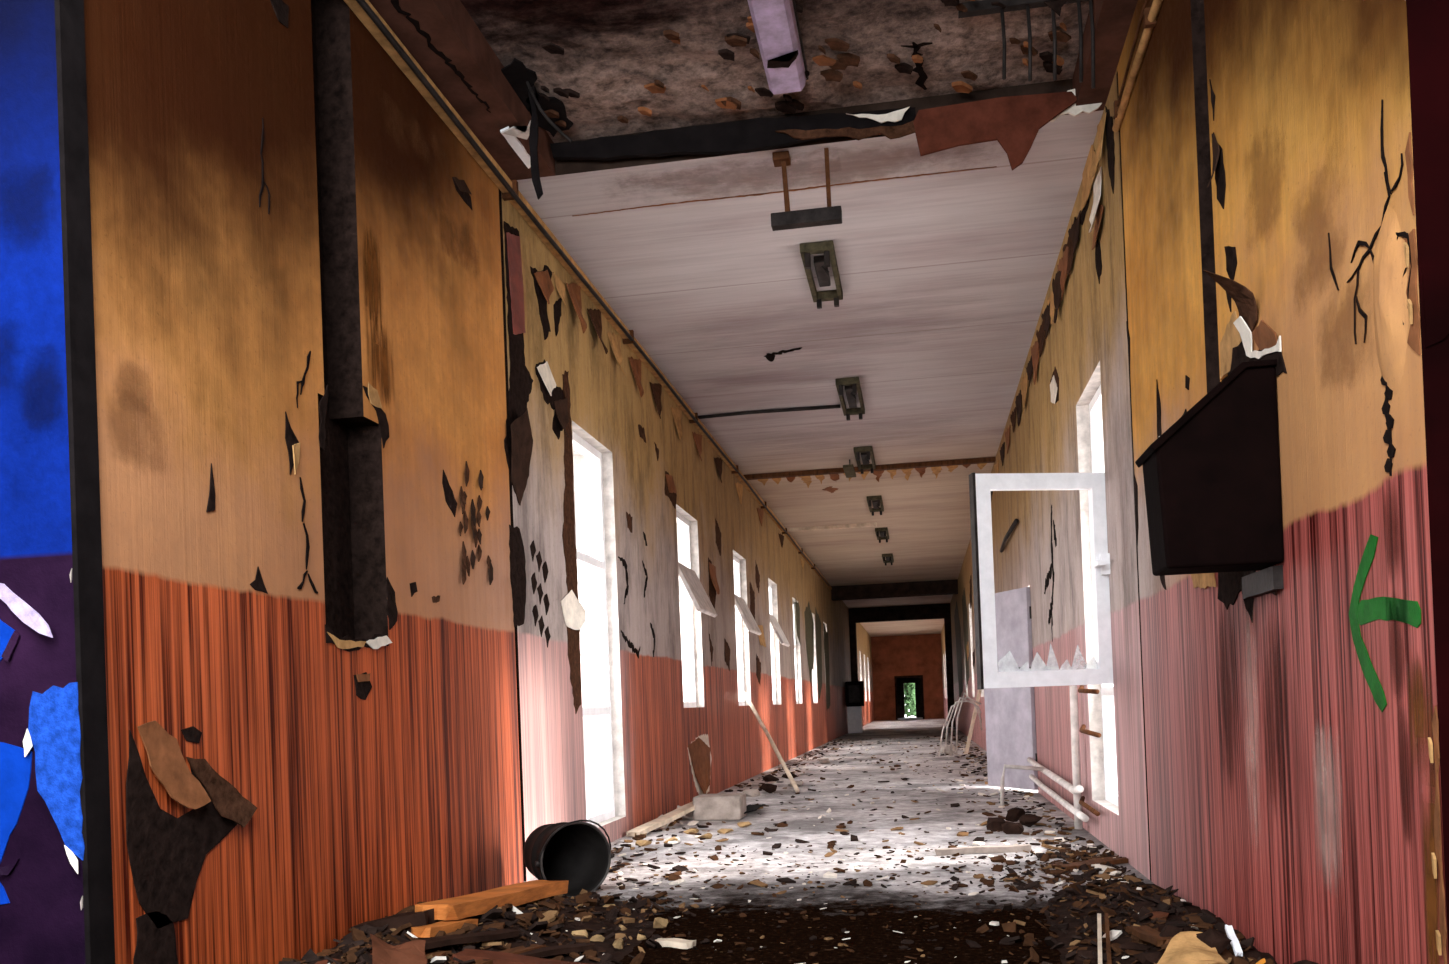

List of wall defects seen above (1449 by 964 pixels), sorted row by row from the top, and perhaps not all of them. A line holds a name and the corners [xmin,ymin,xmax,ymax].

flaking render [501,58,580,137]
peeling [1207,79,1226,209]
crack [1328,100,1412,344]
peeling [285,411,300,475]
peeling [503,106,1115,713]
crack [1380,376,1396,476]
peeling [442,461,493,585]
peeling [0,583,53,662]
flaking render [325,577,440,652]
leakage [1220,623,1236,778]
peeling [0,682,85,905]
peeling [126,721,257,964]